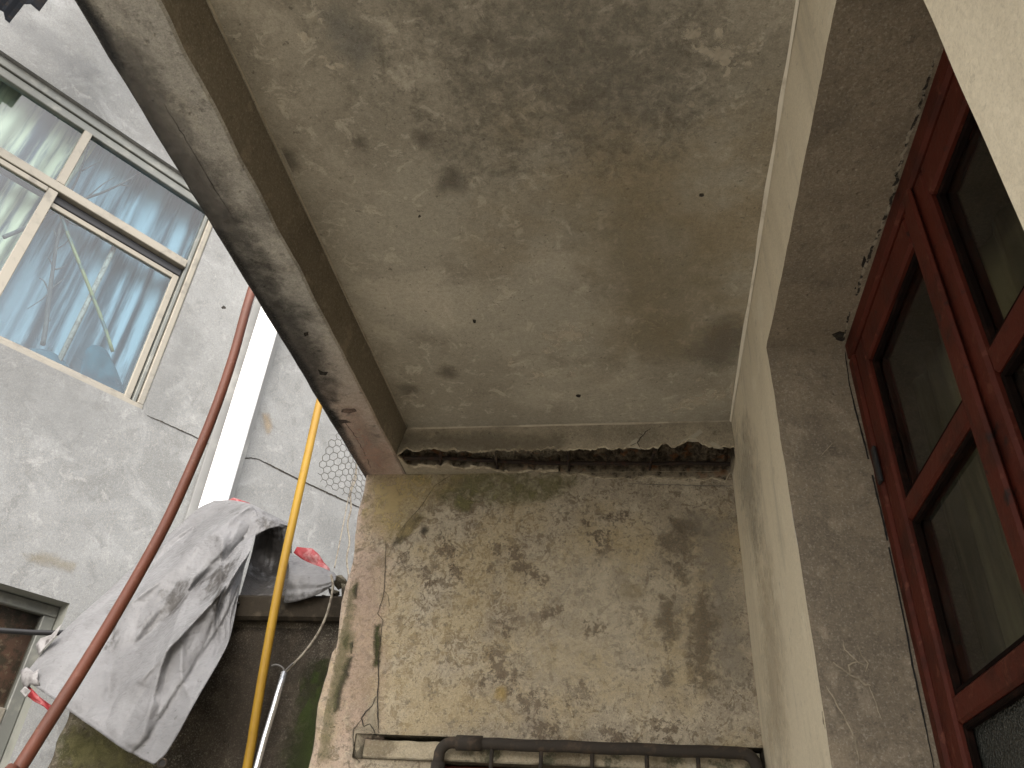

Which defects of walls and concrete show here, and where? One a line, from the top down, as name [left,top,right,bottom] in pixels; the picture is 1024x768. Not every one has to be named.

crack [147,415,208,444]
crack [245,457,359,507]
water stain [367,475,431,544]
spalling [397,429,735,482]
crack [353,475,451,762]
water stain [656,595,721,689]